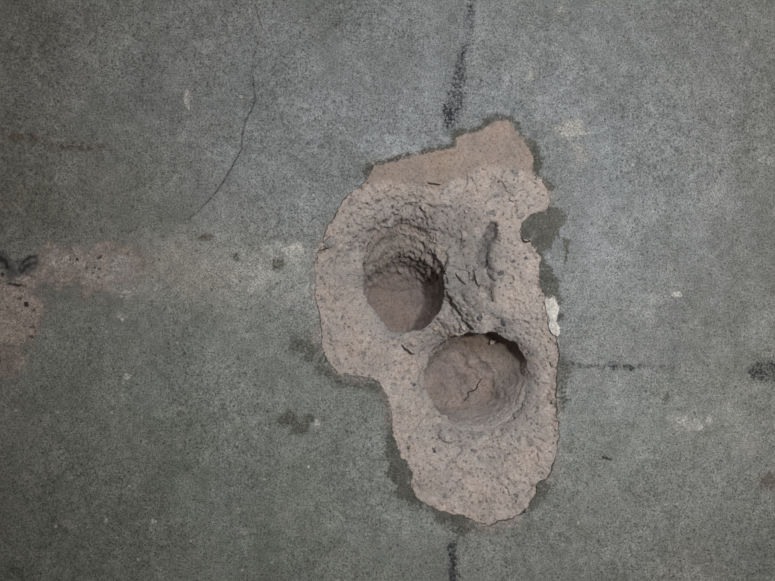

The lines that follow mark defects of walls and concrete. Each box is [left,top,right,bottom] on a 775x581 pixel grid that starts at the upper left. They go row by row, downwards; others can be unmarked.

peeling [0,240,161,379]
spalling [309,119,561,534]